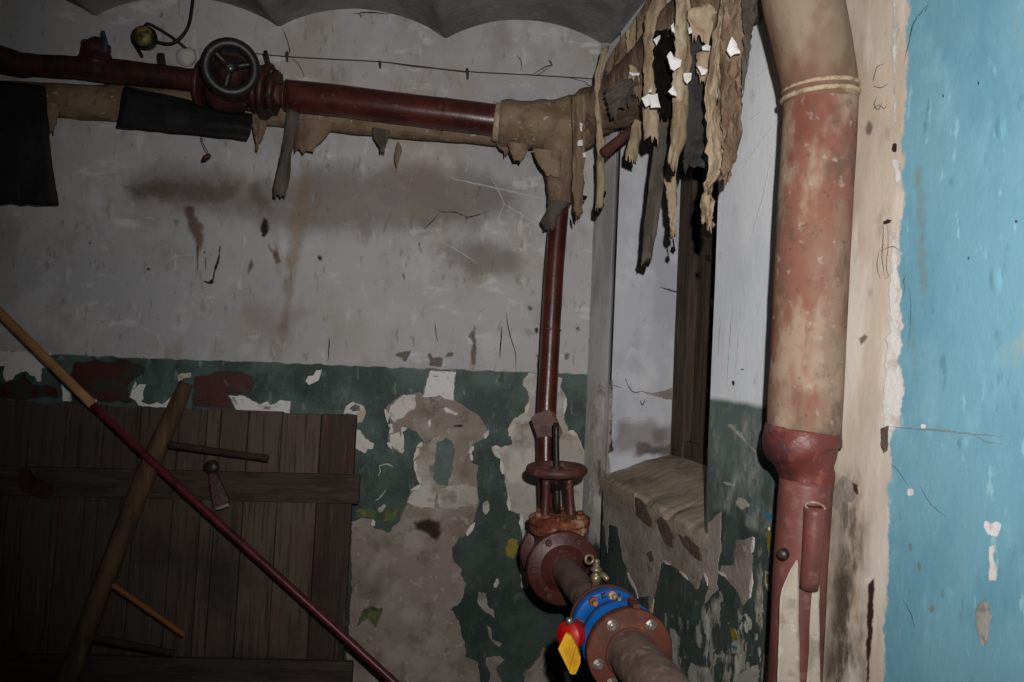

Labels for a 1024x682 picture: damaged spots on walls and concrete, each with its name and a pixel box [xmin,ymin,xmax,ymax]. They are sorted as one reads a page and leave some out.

spalling [726,37,740,57]
spalling [641,51,707,108]
rust [186,207,206,267]
flaking render [880,233,905,453]
peeling [0,351,171,408]
peeling [178,371,291,413]
peeling [306,370,322,385]
spalling [343,353,539,682]
spalling [556,377,773,682]
peeling [984,521,1001,581]
damp [827,549,856,682]
damp [866,580,874,681]